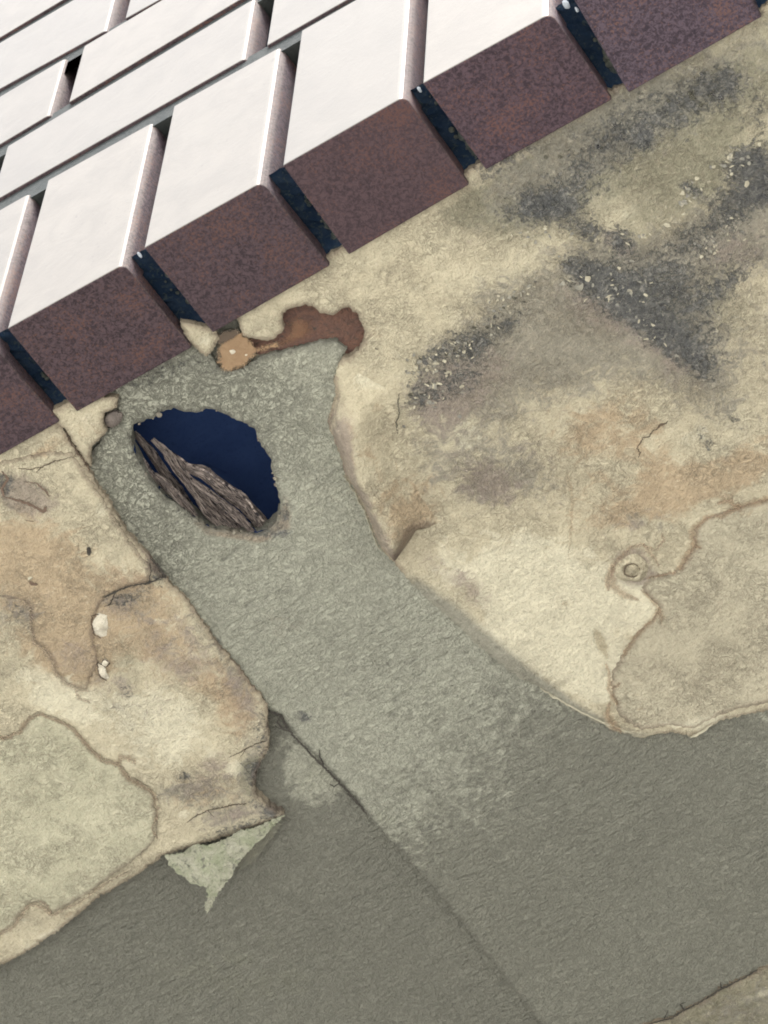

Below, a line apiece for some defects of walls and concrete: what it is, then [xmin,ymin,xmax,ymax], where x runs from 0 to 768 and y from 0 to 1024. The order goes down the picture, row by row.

peeling [559,260,653,307]
corrosion [217,322,308,372]
spalling [89,284,768,1024]
crack [187,803,247,823]